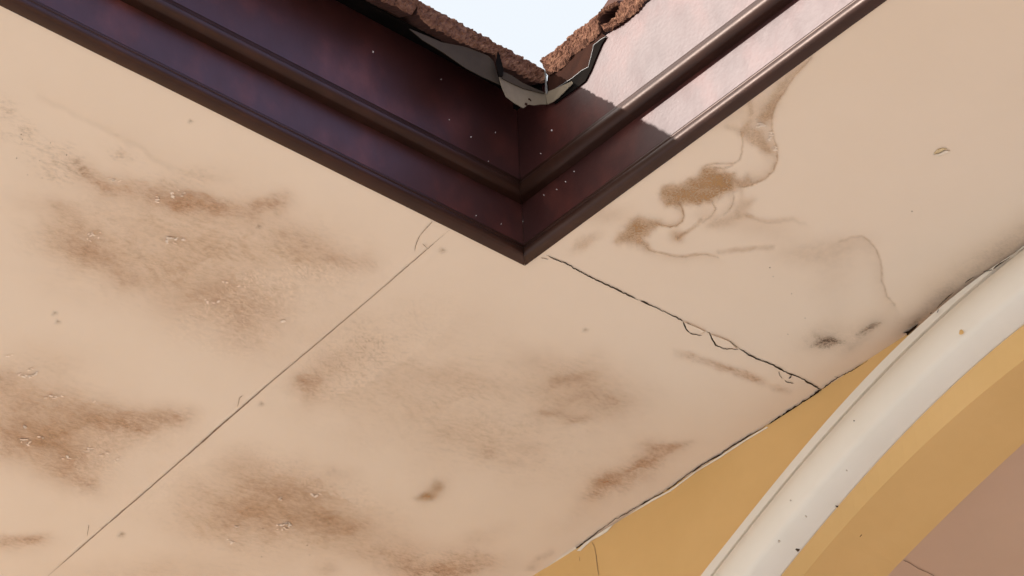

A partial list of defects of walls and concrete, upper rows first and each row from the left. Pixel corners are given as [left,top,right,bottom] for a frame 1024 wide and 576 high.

leakage [662,169,732,228]
crack [543,256,864,576]